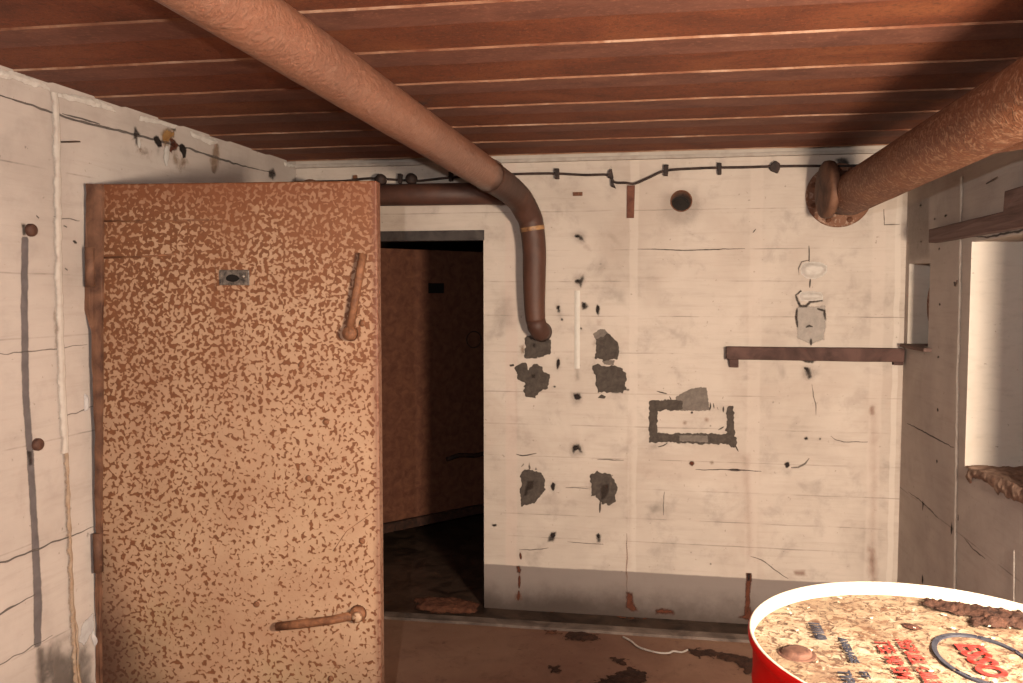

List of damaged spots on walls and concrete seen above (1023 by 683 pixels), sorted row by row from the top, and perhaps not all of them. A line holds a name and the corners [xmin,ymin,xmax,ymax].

spalling [510,335,560,398]
spalling [592,329,629,399]
spalling [520,464,555,507]
spalling [590,471,618,513]
corrosion [740,573,752,620]